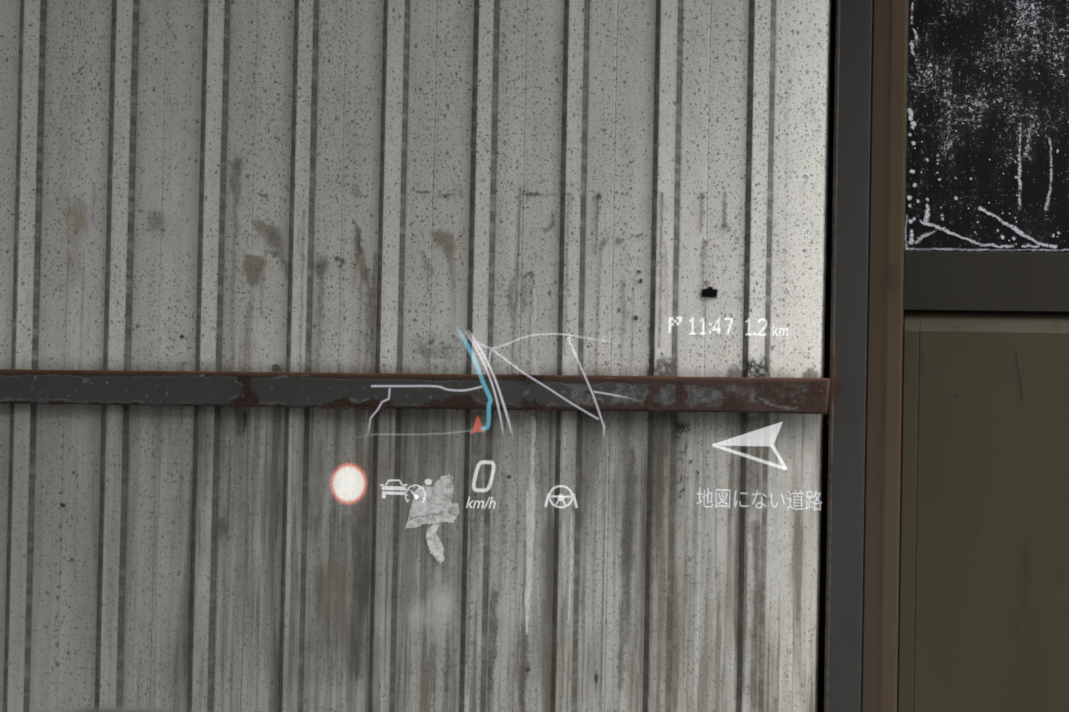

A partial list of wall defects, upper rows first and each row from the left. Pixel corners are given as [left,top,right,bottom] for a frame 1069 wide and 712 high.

water stain [232,221,287,309]
water stain [317,229,376,373]
corrosion [229,375,258,435]
corrosion [318,397,397,411]
corrosion [513,374,544,383]
water stain [472,414,483,511]
water stain [520,416,536,711]